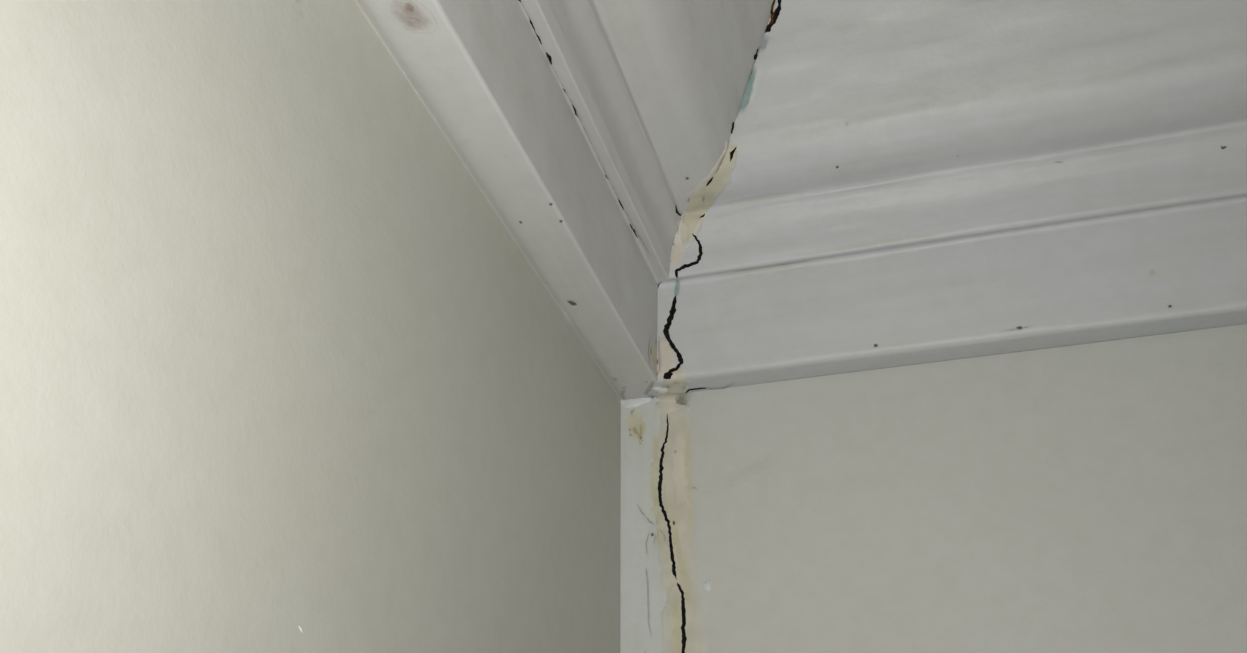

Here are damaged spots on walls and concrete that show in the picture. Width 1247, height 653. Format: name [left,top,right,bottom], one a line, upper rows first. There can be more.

crack [518,0,737,653]
crack [765,0,781,33]